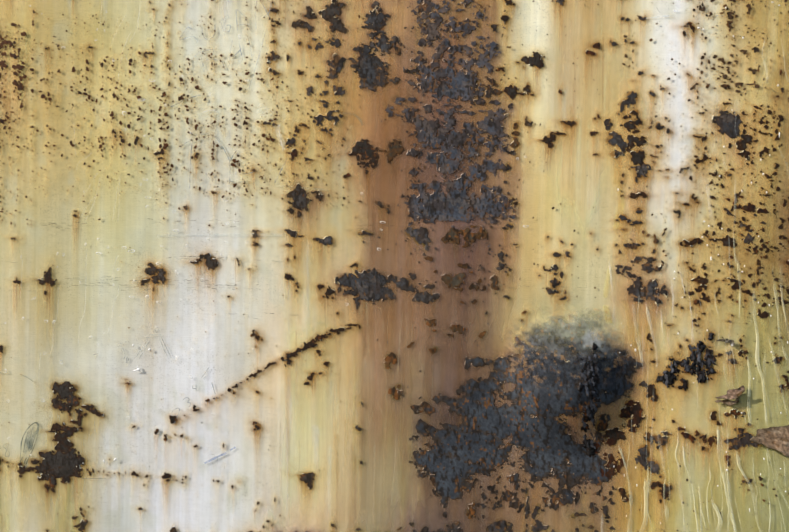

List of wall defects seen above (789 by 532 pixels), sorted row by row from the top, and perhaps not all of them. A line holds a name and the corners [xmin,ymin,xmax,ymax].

peeling [378,0,535,303]
corrosion [140,262,168,298]
corrosion [169,0,789,532]
spalling [655,330,746,399]
corrosion [0,381,148,532]
peeling [461,424,625,529]